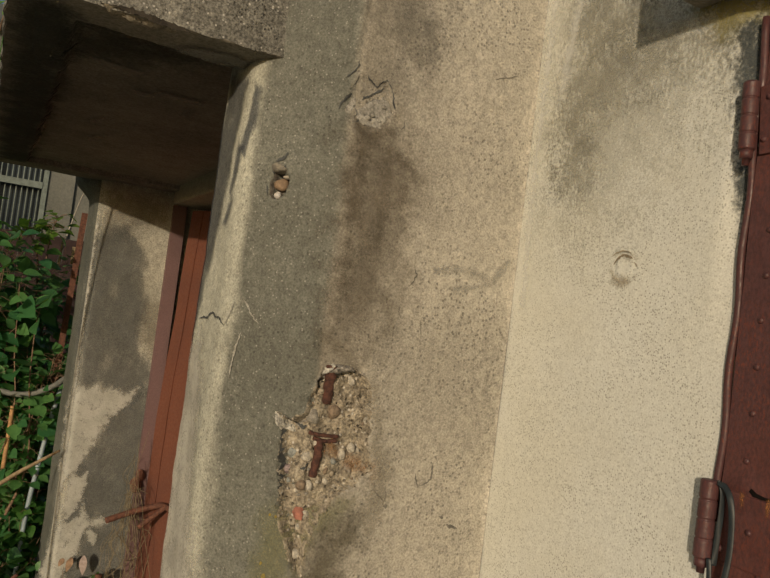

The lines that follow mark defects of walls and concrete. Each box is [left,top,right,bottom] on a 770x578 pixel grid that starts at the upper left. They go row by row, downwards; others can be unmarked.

spalling [266,152,290,199]
spalling [338,61,395,130]
water stain [45,216,150,578]
water stain [160,80,258,578]
crack [200,301,258,376]
spalling [275,363,374,578]